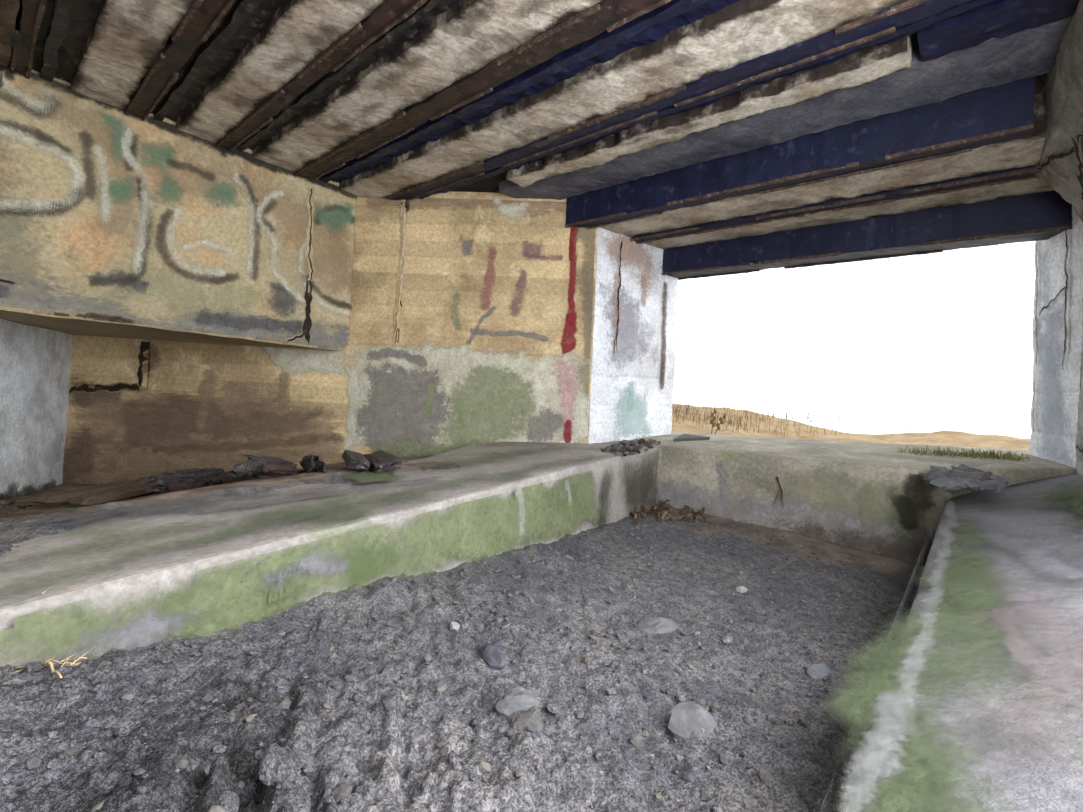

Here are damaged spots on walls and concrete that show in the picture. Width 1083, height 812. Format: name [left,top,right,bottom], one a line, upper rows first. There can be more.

water stain [0,197,350,349]
crack [69,342,150,394]
water stain [0,318,344,498]
water stain [355,348,478,457]